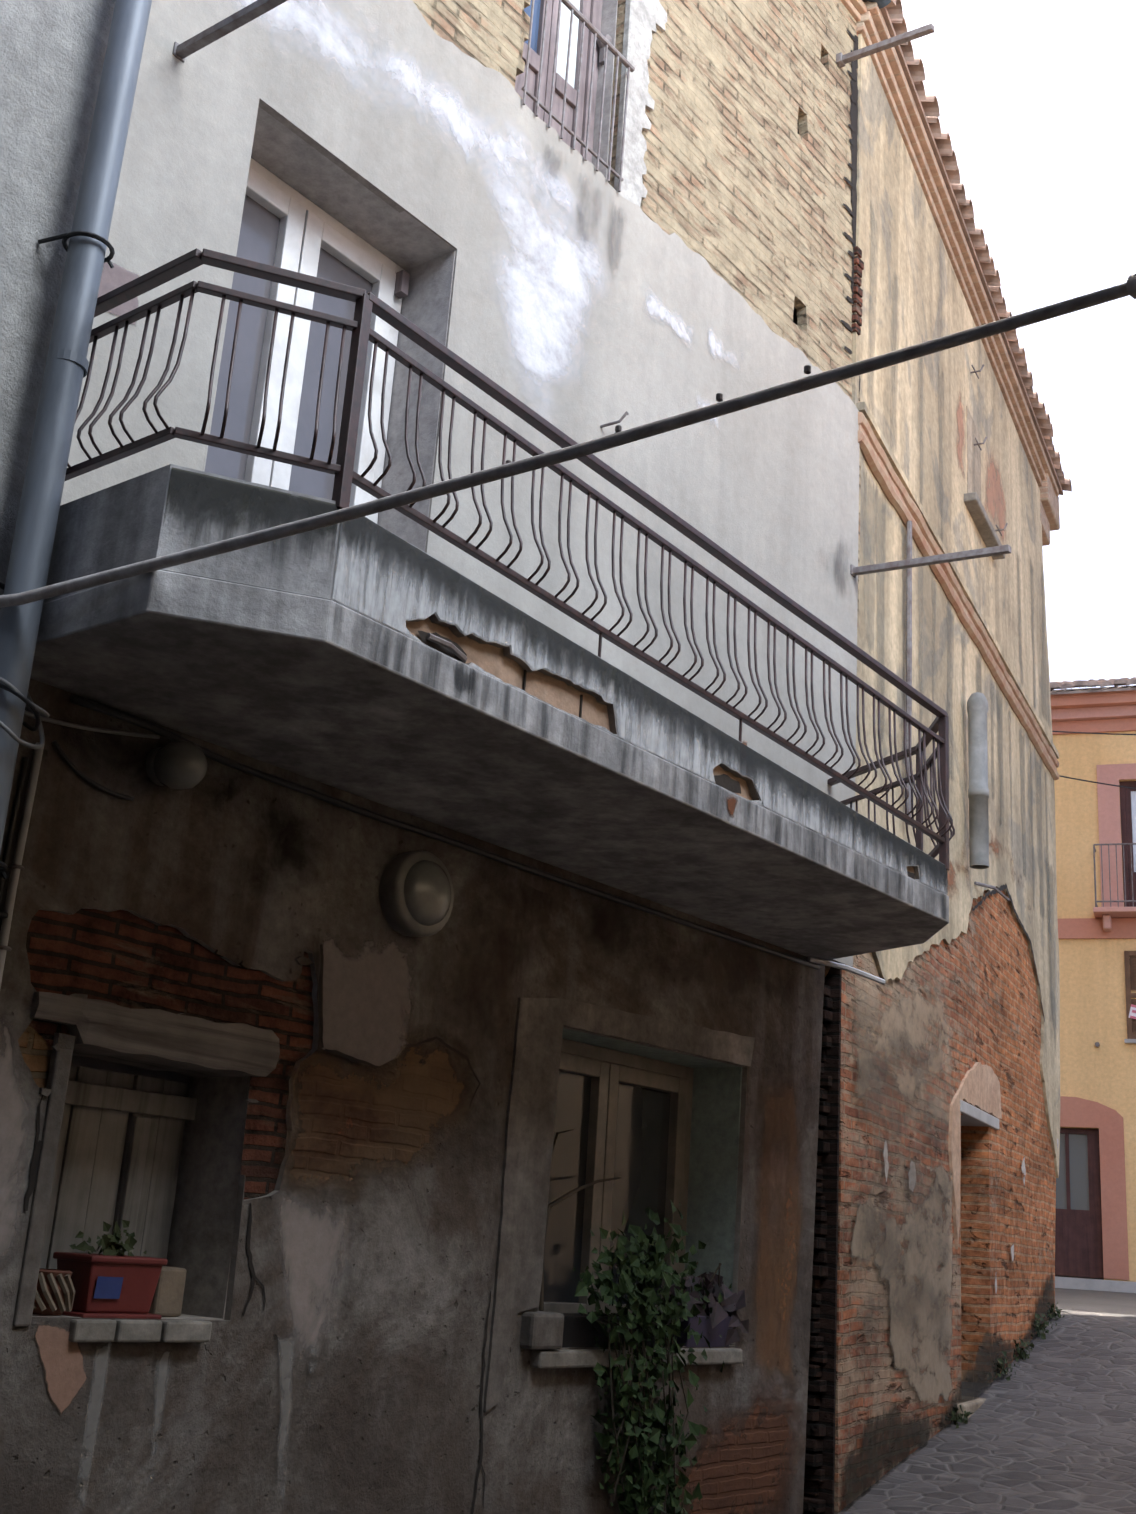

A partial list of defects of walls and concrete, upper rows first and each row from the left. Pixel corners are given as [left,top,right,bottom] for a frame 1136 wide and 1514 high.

damp [244,0,363,67]
damp [388,59,598,378]
spalling [406,618,610,731]
spalling [713,765,764,816]
spalling [18,1019,70,1097]
spalling [26,908,314,1200]
peeling [908,1161,916,1192]